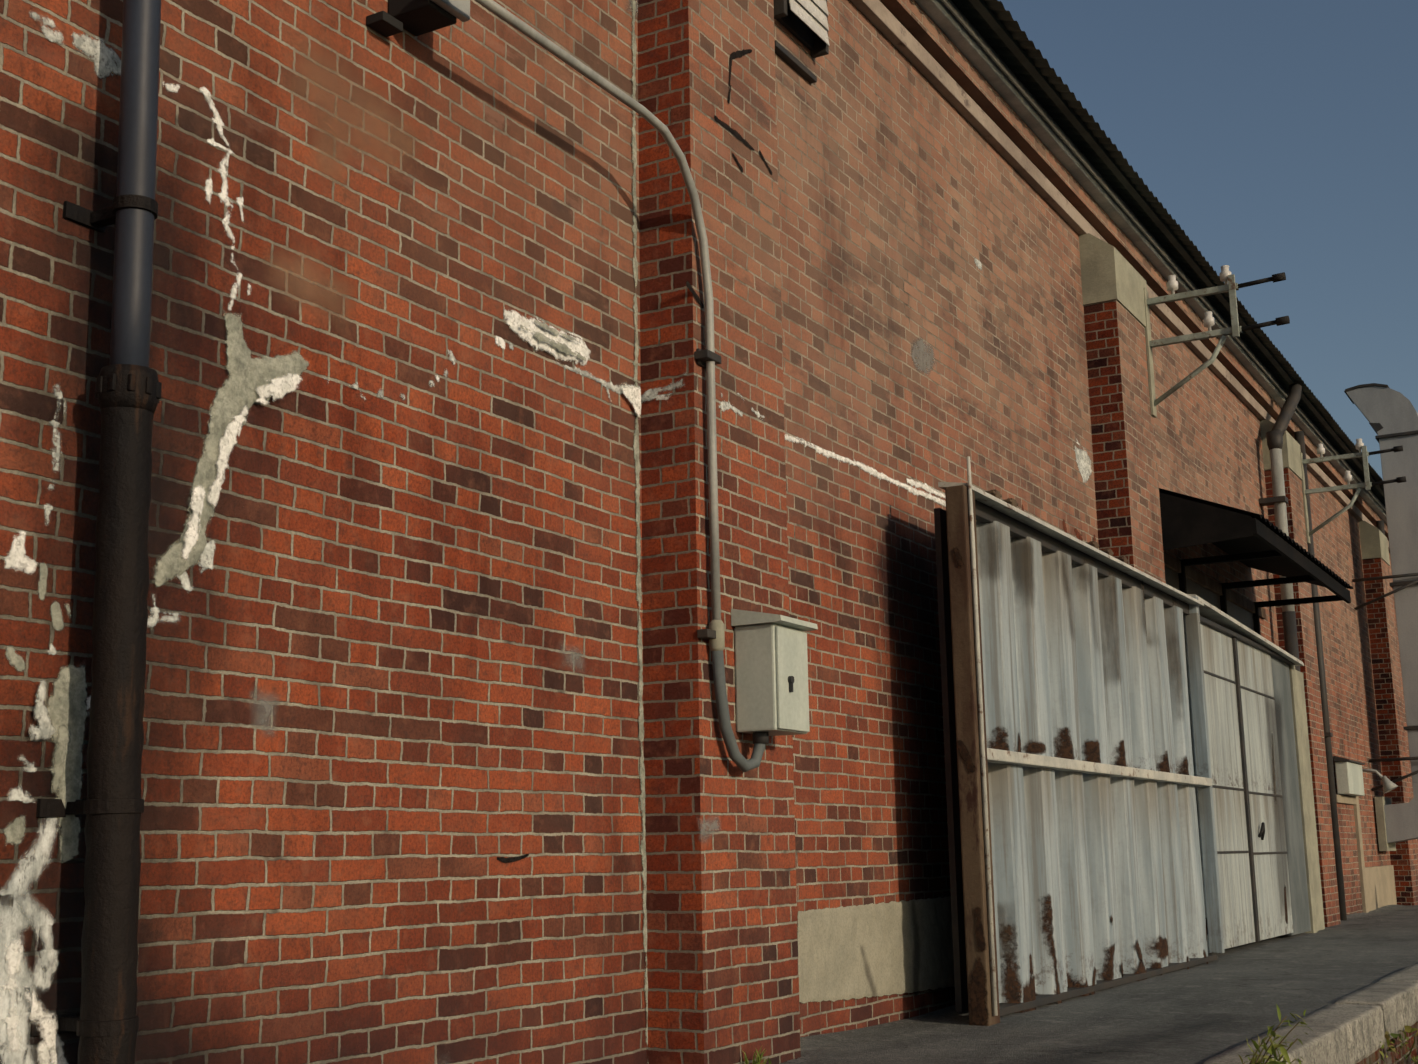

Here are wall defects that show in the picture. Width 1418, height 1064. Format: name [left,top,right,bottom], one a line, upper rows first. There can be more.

peeling [31,12,121,79]
peeling [495,336,514,350]
peeling [177,541,216,591]
peeling [5,531,71,655]
peeling [6,647,25,671]
corrosion [990,727,1127,767]
corrosion [1157,751,1189,775]
peeling [0,893,67,1064]
corrosion [969,895,1168,1026]